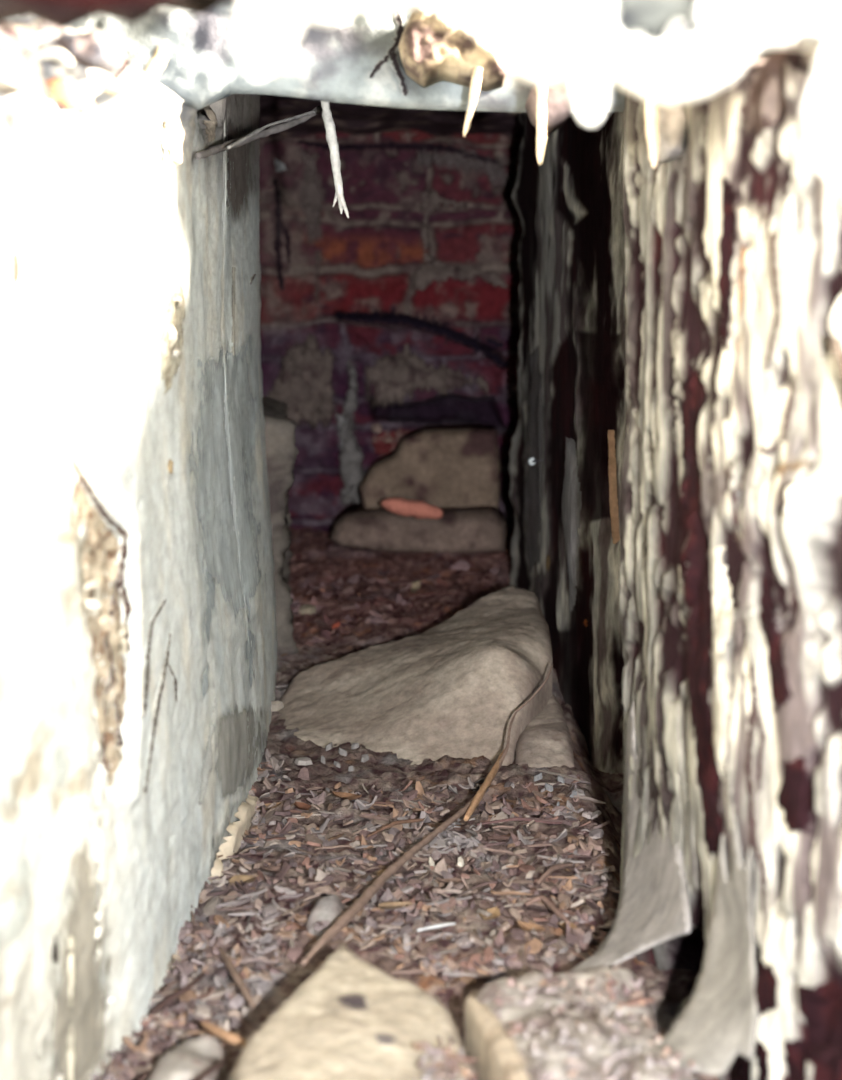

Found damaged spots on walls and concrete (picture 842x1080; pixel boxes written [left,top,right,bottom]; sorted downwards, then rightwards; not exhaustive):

peeling [163,115,184,167]
spalling [740,47,816,138]
peeling [717,177,738,352]
spalling [158,275,185,394]
peeling [785,482,812,523]
spalling [72,432,143,788]
peeling [674,367,735,859]
peeling [747,578,793,714]
peeling [777,756,824,835]
peeling [734,1040,769,1080]
peeling [755,961,778,1016]
peeling [782,979,842,1080]